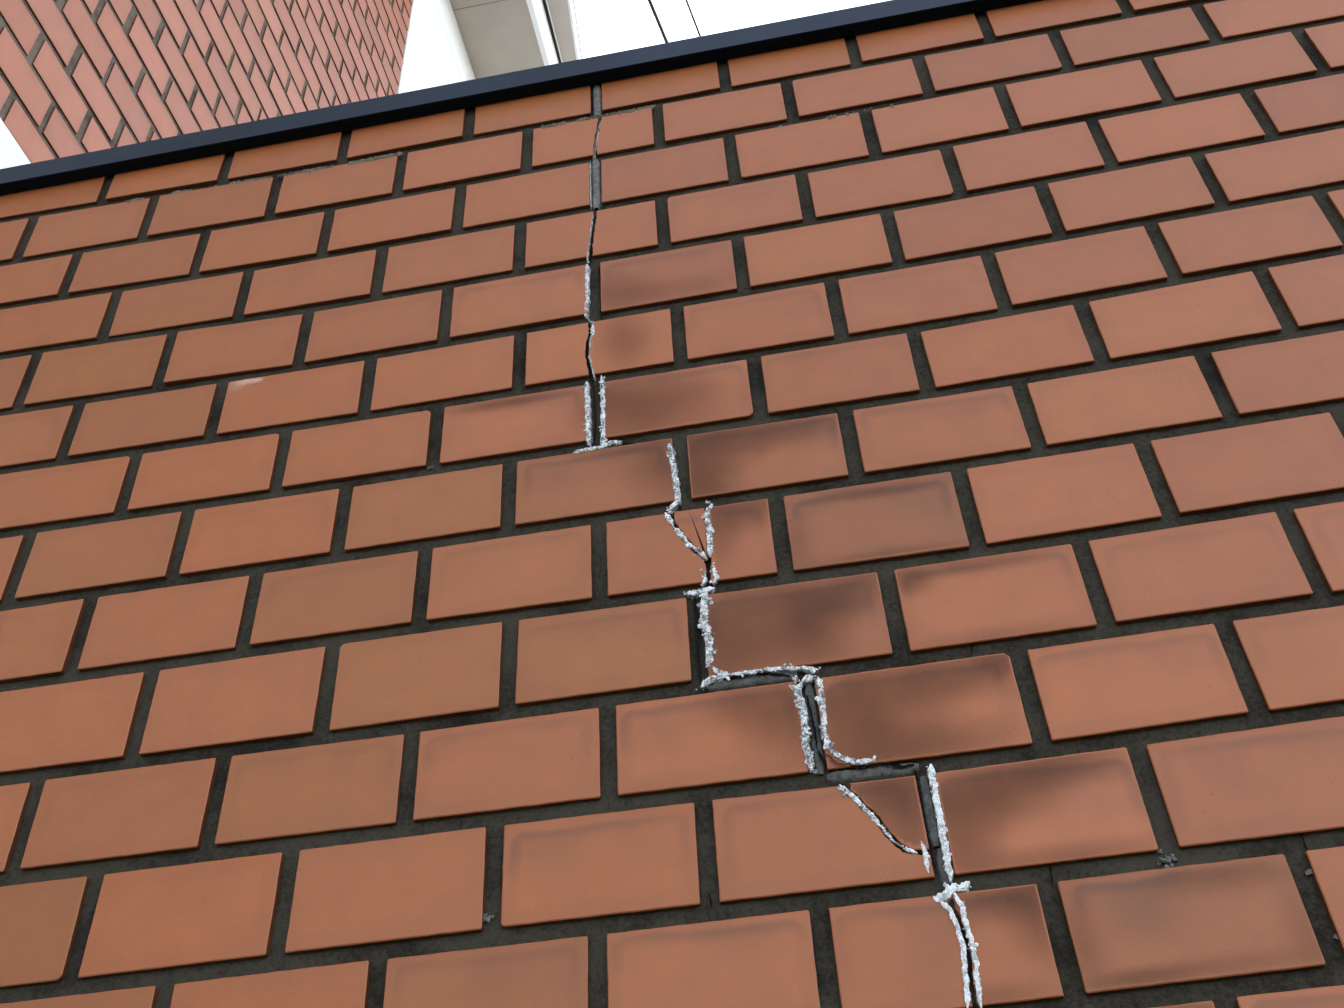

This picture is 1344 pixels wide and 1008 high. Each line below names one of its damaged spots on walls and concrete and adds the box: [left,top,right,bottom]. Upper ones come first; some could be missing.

crack [586,203,636,446]
crack [666,499,936,870]
crack [949,904,976,1008]